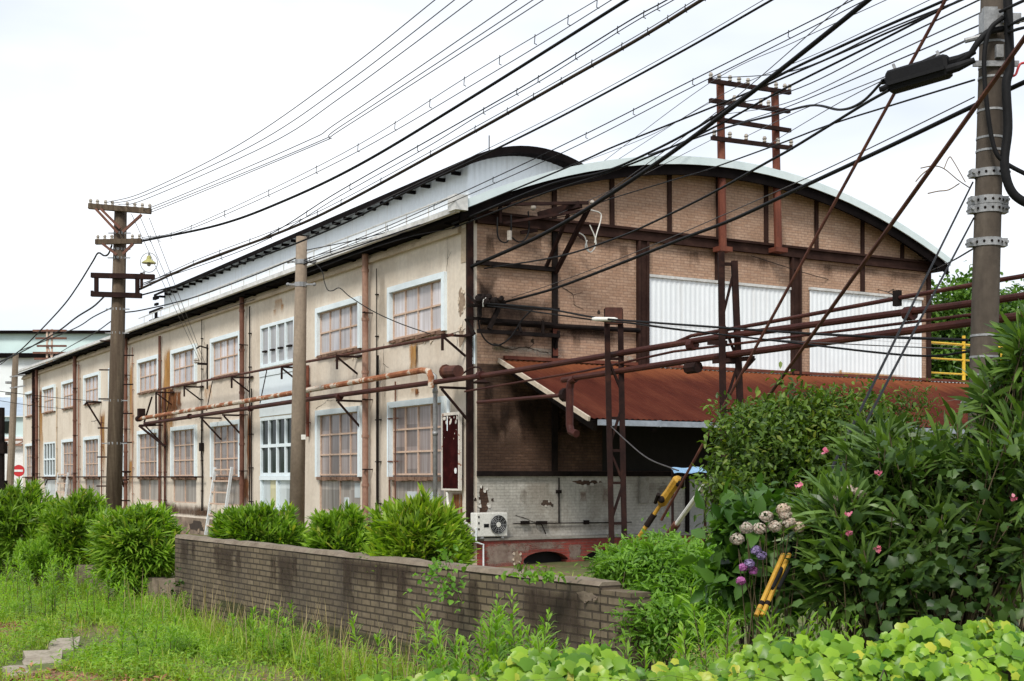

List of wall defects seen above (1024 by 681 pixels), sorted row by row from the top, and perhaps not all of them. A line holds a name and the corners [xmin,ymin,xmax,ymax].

leakage [480,283,494,314]
corrosion [161,352,181,448]
peeling [477,484,494,513]
leakage [343,561,410,596]